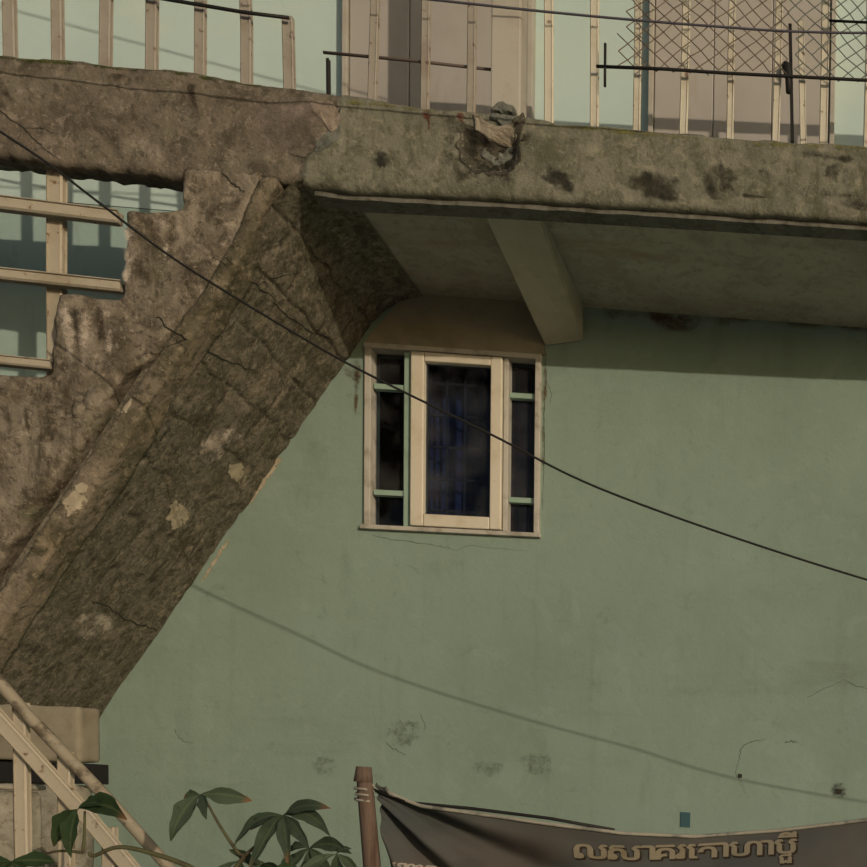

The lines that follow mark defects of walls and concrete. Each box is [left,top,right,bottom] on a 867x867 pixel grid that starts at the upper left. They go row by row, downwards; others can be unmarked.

spalling [252,100,341,152]
spalling [455,101,528,180]
damp [543,170,573,192]
damp [632,171,677,201]
crack [156,317,187,348]
crack [207,351,254,370]
flaking render [228,463,246,483]
flaking render [62,482,90,517]
flaking render [165,500,190,530]
crack [91,600,157,631]